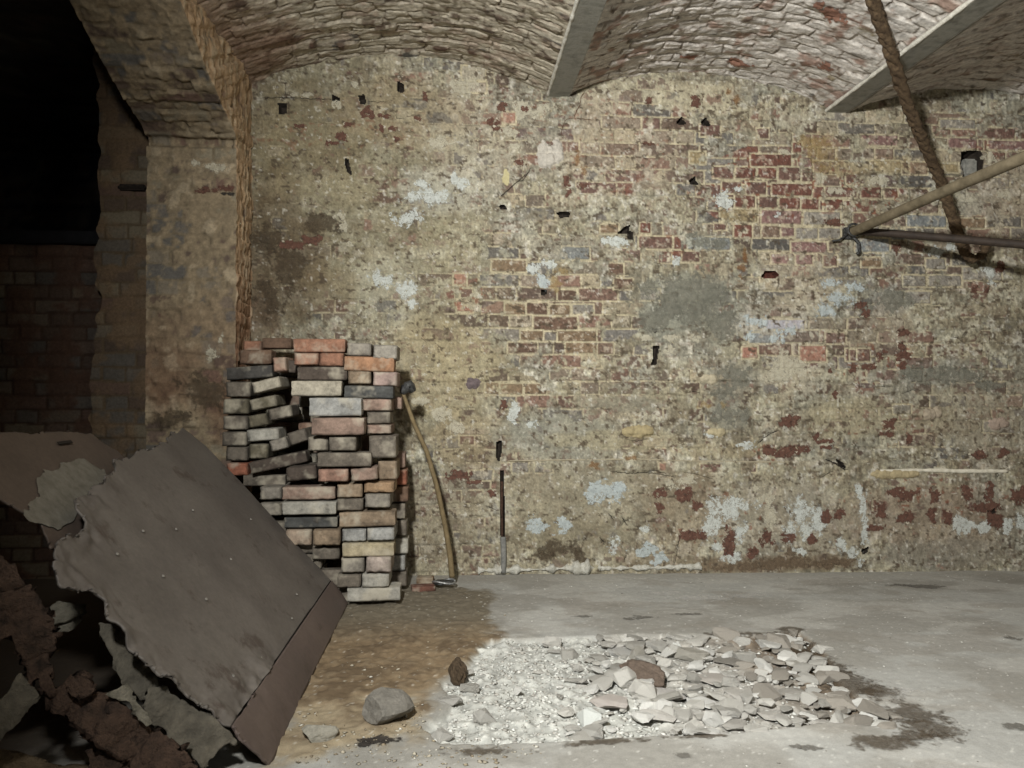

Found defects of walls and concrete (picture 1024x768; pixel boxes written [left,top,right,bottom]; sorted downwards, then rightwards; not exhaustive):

spalling [690,95,710,126]
spalling [486,98,551,186]
spalling [960,150,998,177]
water stain [389,171,478,228]
peeling [713,186,743,210]
peeling [601,225,633,248]
spalling [760,271,779,279]
peeling [626,231,740,365]
spalling [648,474,704,514]
spalling [722,524,818,559]
water stain [700,483,869,572]
spalling [866,481,1024,537]